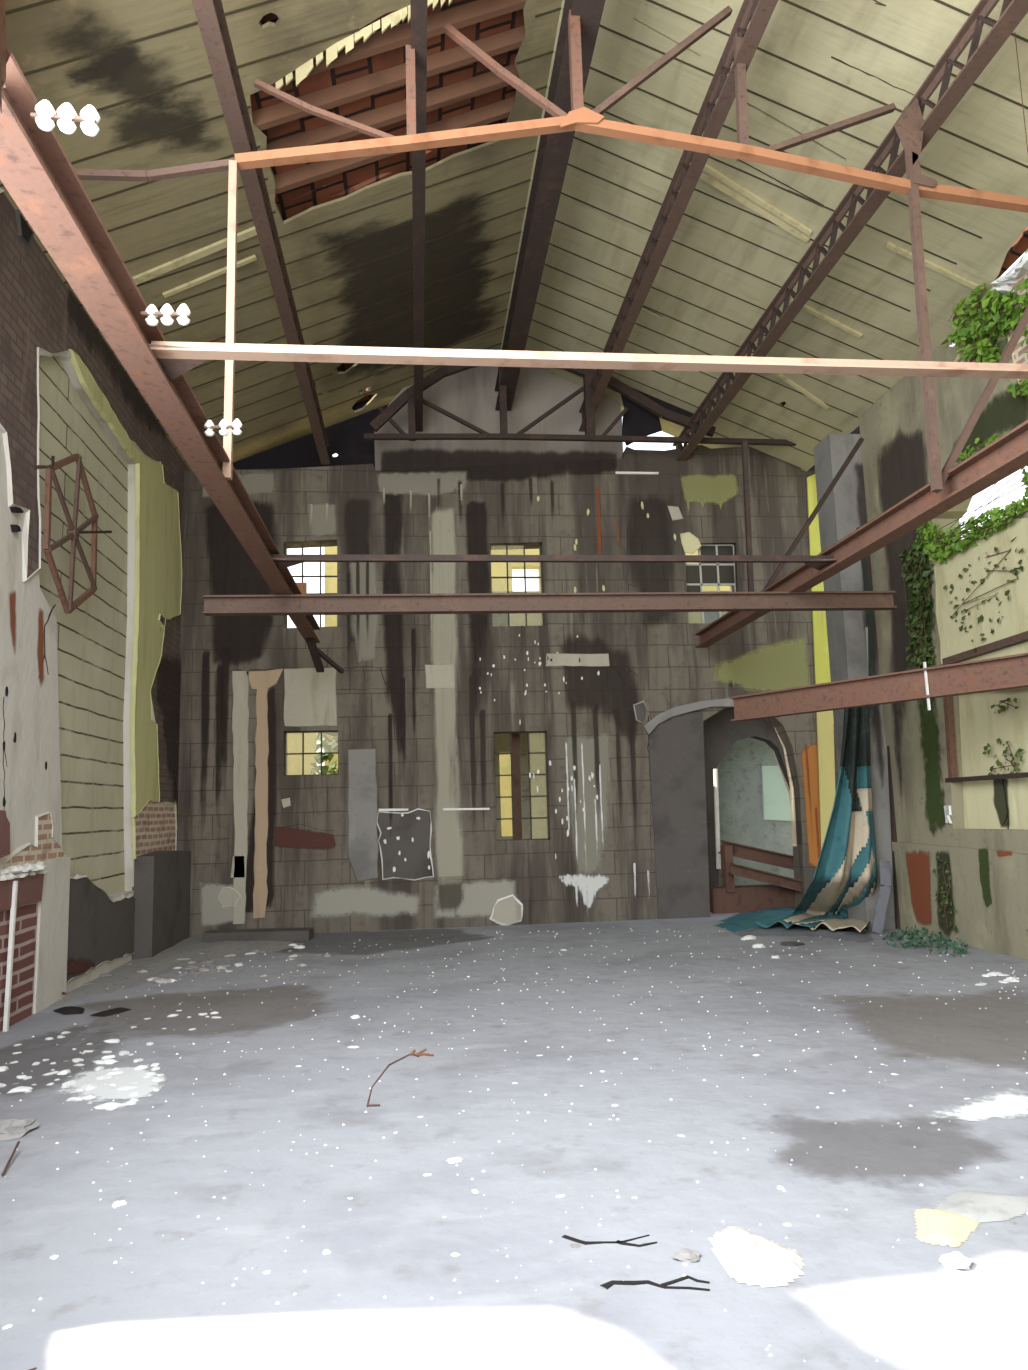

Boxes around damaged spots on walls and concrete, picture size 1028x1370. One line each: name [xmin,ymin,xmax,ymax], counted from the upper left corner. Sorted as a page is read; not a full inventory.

water stain [62,15,214,146]
spalling [0,188,190,860]
water stain [203,487,273,595]
water stain [238,474,274,541]
water stain [309,449,617,594]
flaking render [933,516,1028,664]
spalling [0,812,66,872]
water stain [201,615,272,802]
water stain [313,614,515,917]
water stain [559,638,638,908]
spalling [944,805,952,824]